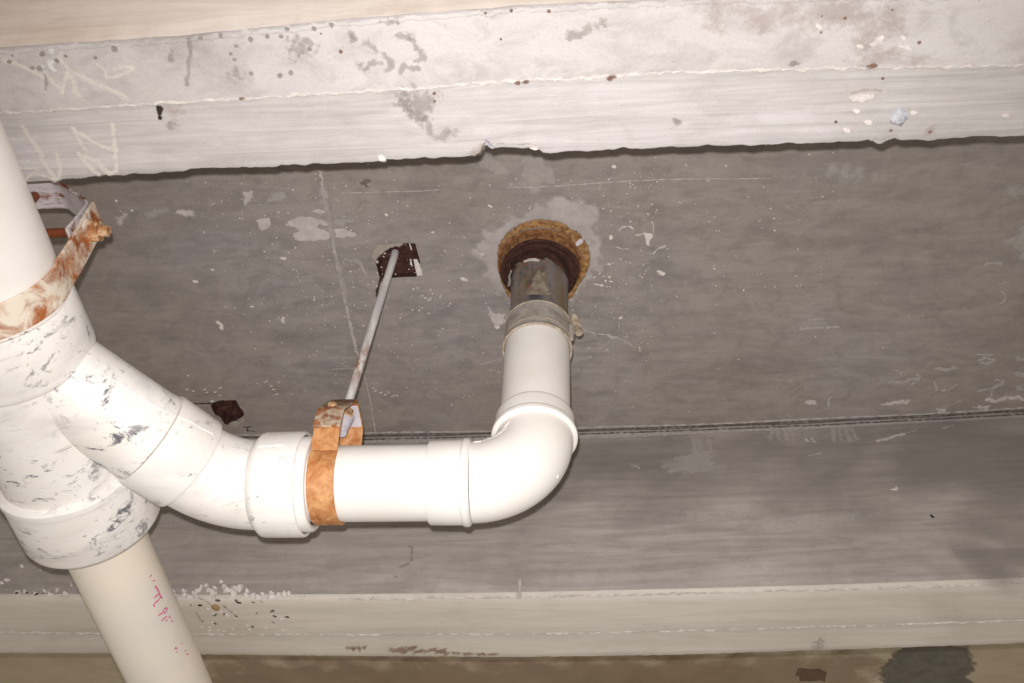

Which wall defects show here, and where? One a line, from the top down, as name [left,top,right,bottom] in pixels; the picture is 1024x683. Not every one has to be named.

rust [372,243,423,297]
rust [497,219,590,300]
rust [194,400,245,428]
water stain [881,646,974,683]